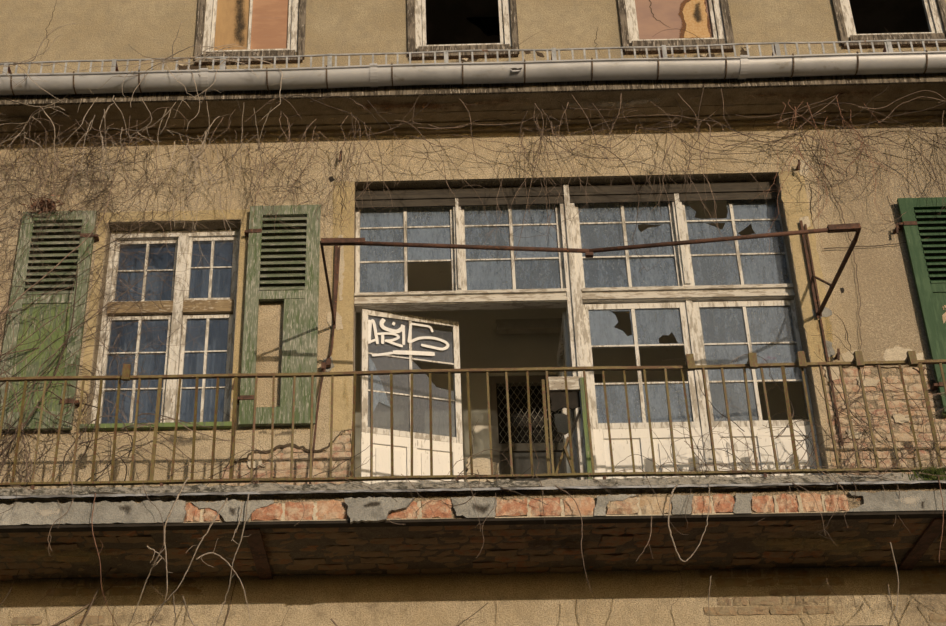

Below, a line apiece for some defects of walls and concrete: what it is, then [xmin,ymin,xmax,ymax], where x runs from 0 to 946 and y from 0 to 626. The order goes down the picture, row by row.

spalling [691,346,946,515]
spalling [222,429,352,486]
spalling [183,503,220,523]
spalling [250,500,348,522]
spalling [387,486,595,520]
spalling [606,496,672,516]